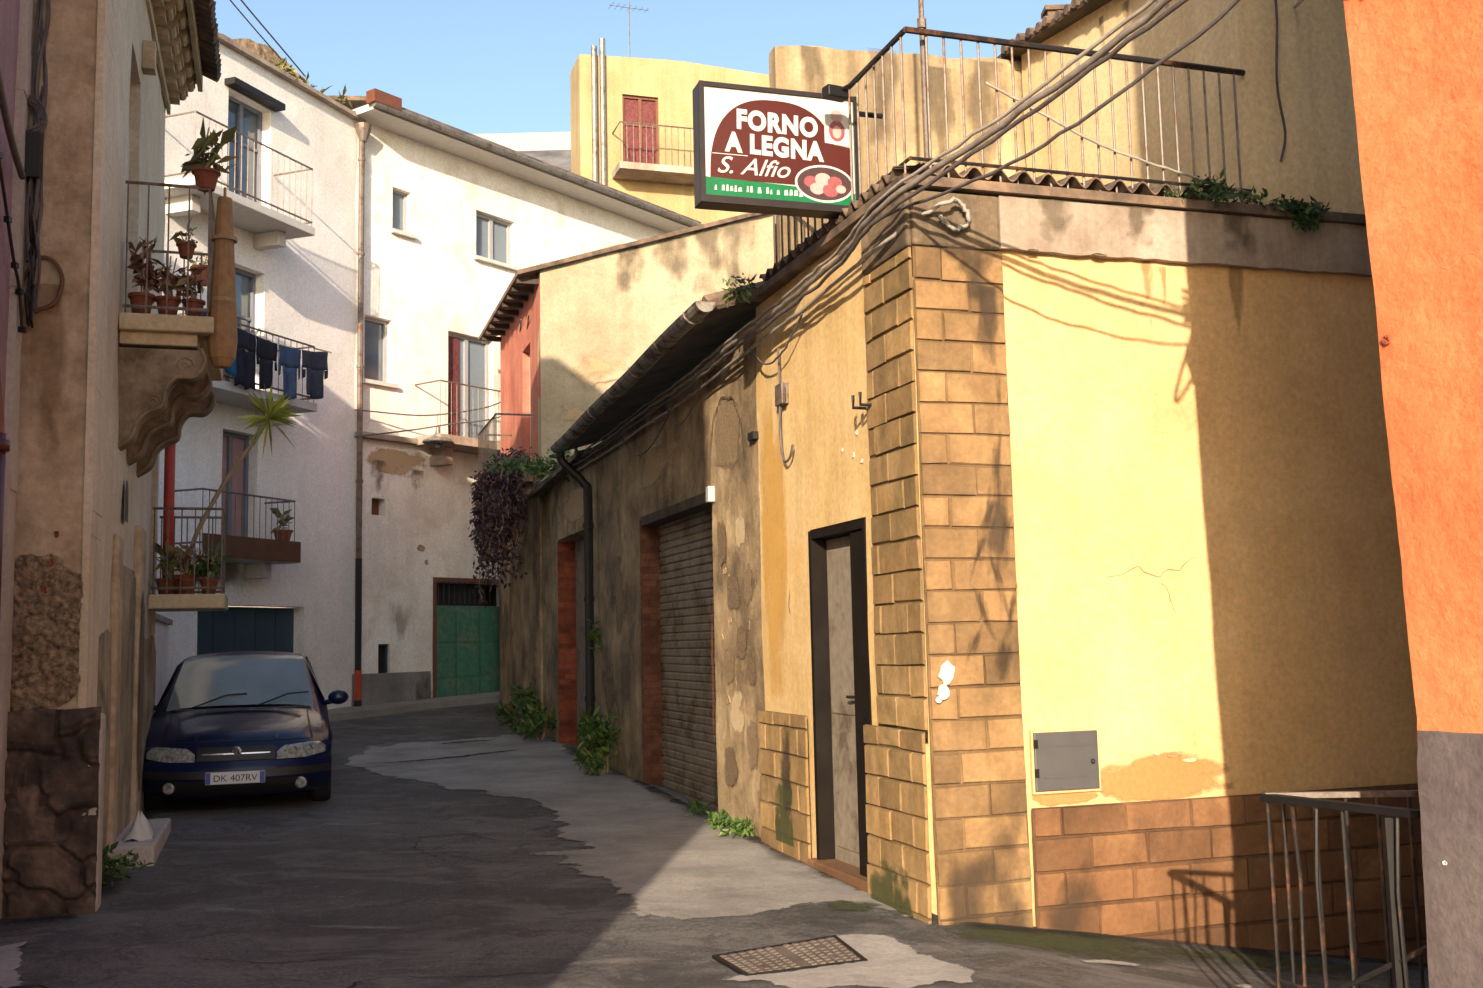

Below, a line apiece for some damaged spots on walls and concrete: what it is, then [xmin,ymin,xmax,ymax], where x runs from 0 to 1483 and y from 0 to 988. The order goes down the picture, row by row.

peeling [369,449,424,485]
water stain [988,504,1005,554]
crack [1105,558,1192,612]
water stain [1033,751,1225,806]